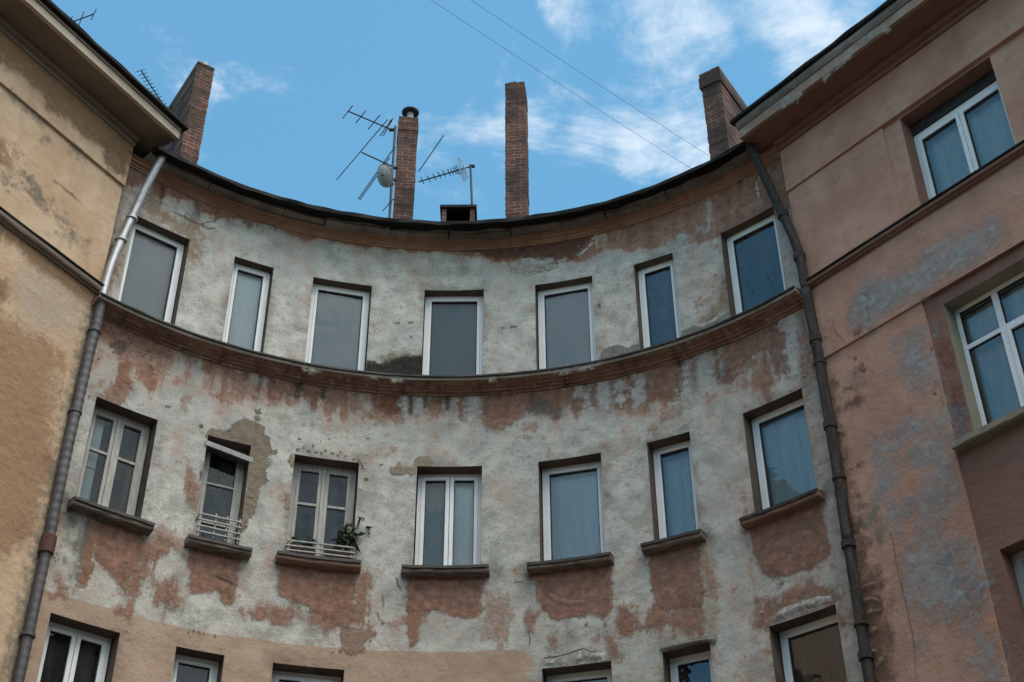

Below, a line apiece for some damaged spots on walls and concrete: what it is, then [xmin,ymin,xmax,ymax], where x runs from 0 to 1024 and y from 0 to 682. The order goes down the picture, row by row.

water stain [366,352,422,375]
peeling [483,362,689,439]
flaking render [199,409,353,533]
peeling [95,521,718,662]
peeling [750,502,847,628]